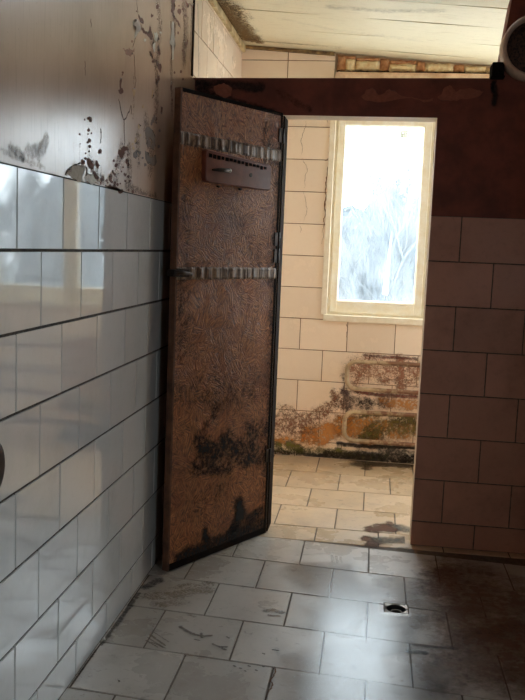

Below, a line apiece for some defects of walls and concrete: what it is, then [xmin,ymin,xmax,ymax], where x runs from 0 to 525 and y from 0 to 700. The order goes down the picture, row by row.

mould [216,0,263,44]
peeling [66,0,194,198]
crack [321,152,329,240]
rust [349,354,420,410]
water stain [180,374,390,476]
rust [274,415,416,446]
water stain [320,442,415,463]
water stain [361,522,411,550]